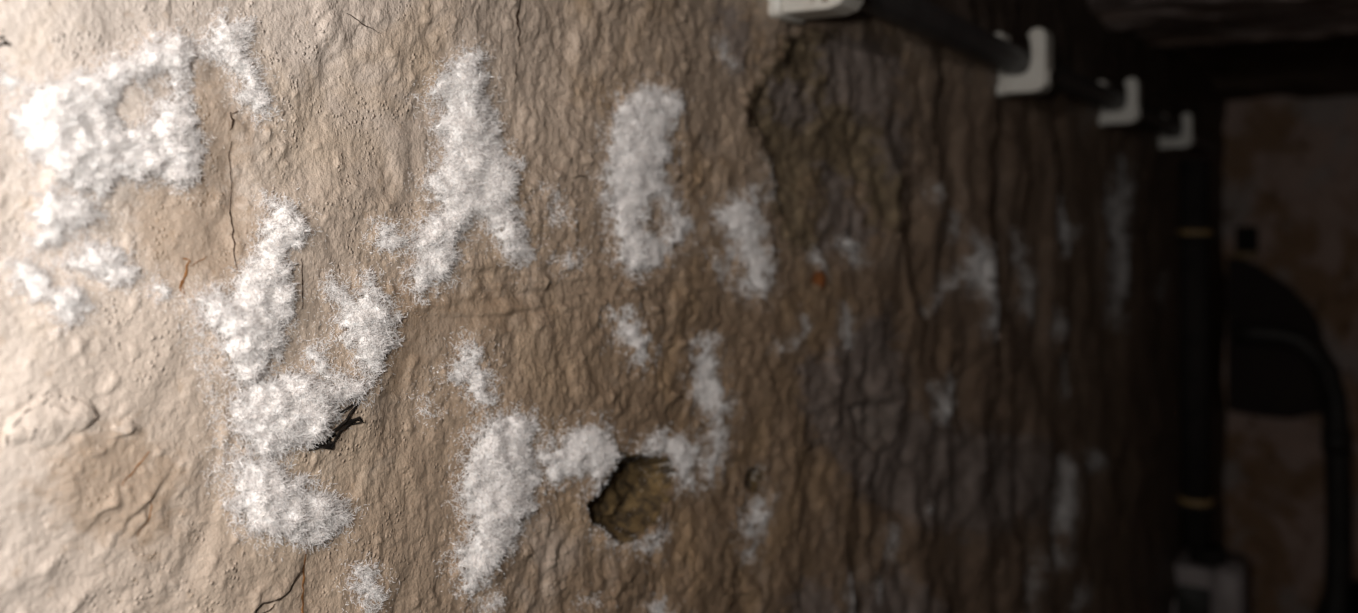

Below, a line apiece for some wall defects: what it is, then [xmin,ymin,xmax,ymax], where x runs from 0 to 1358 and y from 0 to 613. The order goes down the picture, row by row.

water stain [0,6,878,613]
spalling [587,451,675,545]
crack [255,564,304,613]